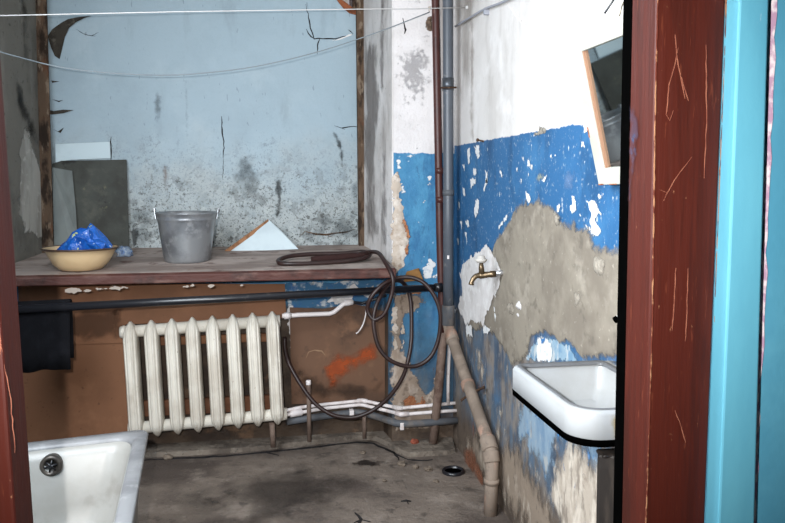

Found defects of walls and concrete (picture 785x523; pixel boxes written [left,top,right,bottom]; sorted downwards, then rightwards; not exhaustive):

crack [306,7,352,51]
flaking render [390,155,412,273]
peeling [423,259,437,279]
peeling [458,145,488,208]
flaking render [454,192,618,365]
flaking render [497,405,601,523]